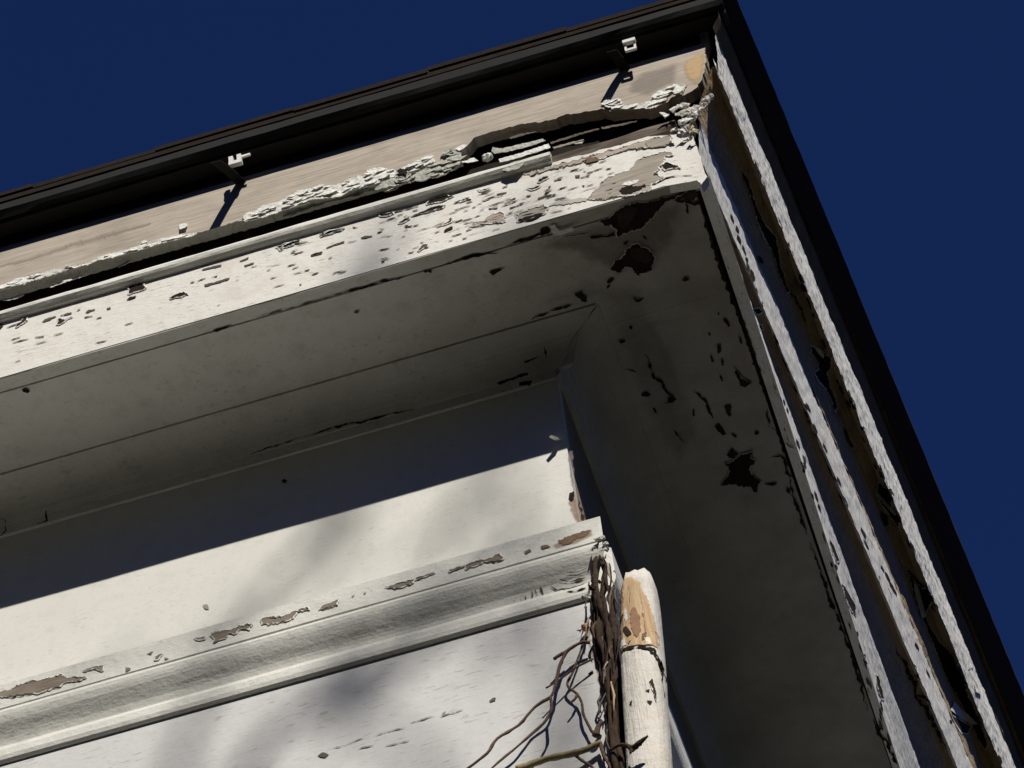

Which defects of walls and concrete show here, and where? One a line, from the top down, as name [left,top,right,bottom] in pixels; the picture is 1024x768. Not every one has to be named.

peeling [240,83,714,287]